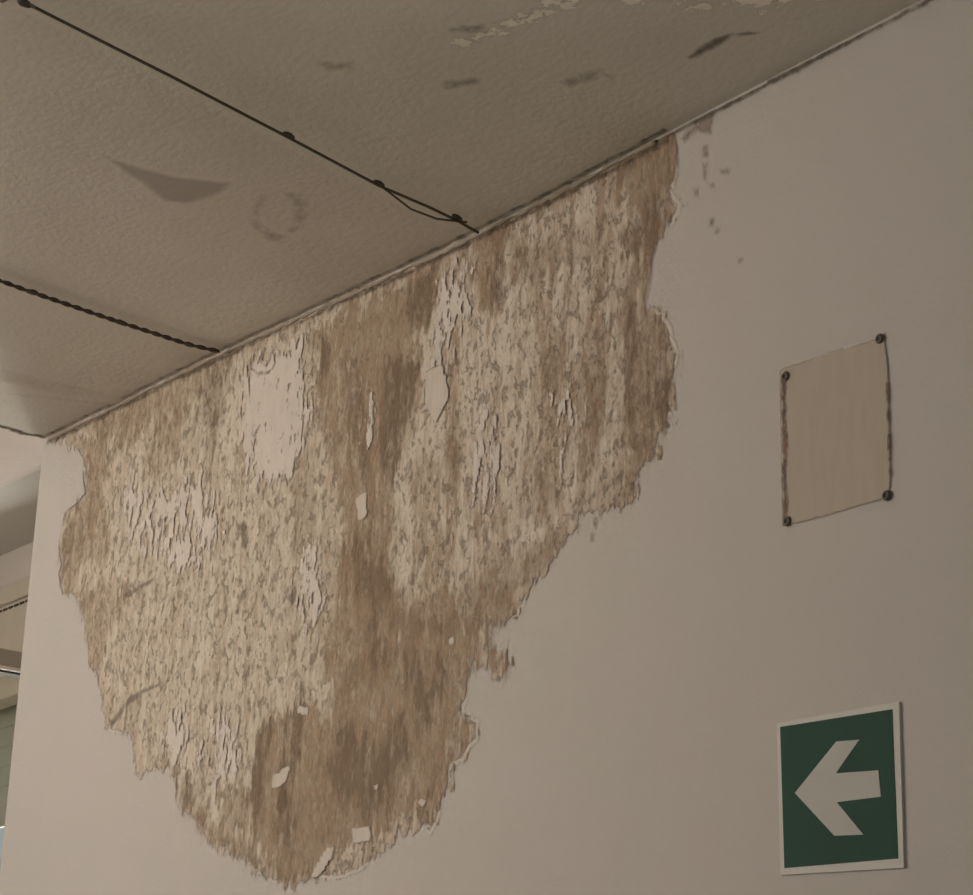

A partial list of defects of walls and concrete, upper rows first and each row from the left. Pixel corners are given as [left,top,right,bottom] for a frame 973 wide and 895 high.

peeling [450,0,579,50]
peeling [54,117,711,892]